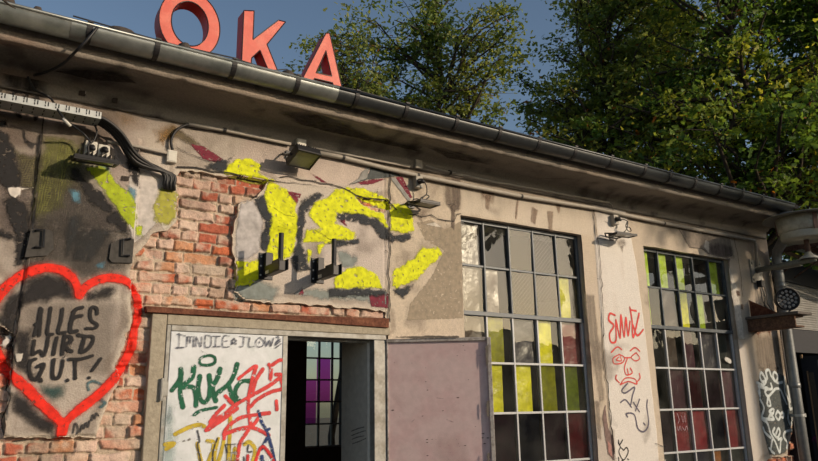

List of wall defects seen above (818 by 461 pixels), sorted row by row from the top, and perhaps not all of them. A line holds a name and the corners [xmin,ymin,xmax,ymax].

water stain [284,114,417,151]
flaking render [0,171,387,461]